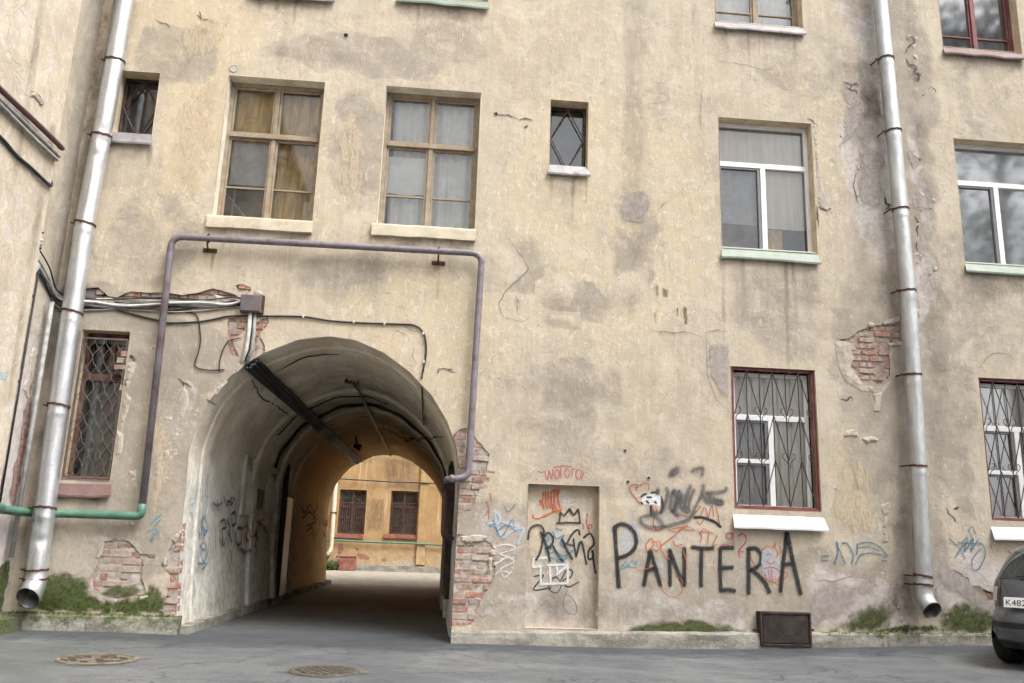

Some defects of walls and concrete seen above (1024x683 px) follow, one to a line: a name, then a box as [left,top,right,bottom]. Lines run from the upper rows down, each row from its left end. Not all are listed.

water stain [842,81,880,142]
crack [499,235,531,322]
peeling [114,351,136,455]
spalling [84,284,269,395]
spalling [835,316,902,412]
spalling [87,523,186,615]
spalling [450,428,507,634]